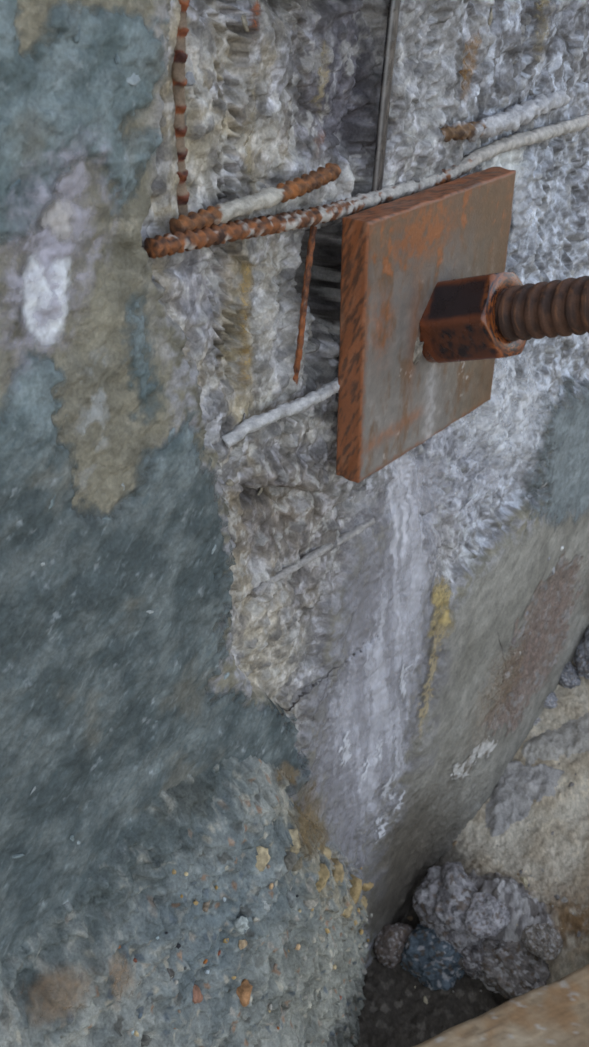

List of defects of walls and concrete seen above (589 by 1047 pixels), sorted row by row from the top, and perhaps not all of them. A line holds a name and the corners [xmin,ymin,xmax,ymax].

peeling [0,353,311,962]
spalling [0,0,589,739]
spalling [451,546,584,781]